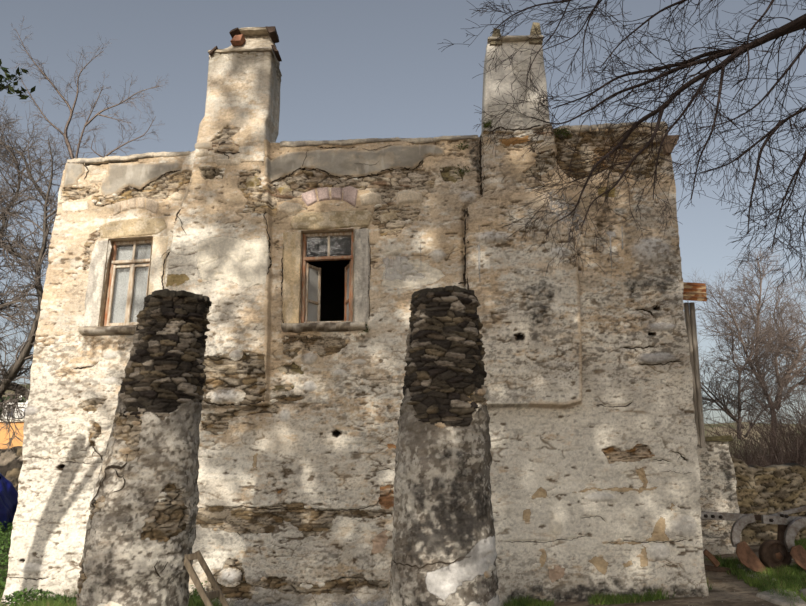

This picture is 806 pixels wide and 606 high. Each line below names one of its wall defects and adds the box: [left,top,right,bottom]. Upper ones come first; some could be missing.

spalling [58,166,226,213]
spalling [208,125,240,155]
crack [268,145,423,184]
spalling [238,166,466,236]
spalling [483,124,665,182]
crack [161,209,187,289]
spalling [78,236,305,462]
spalling [277,335,349,375]
spalling [380,259,489,430]
spalling [572,444,657,494]
spalling [141,483,394,542]
crack [392,555,471,569]